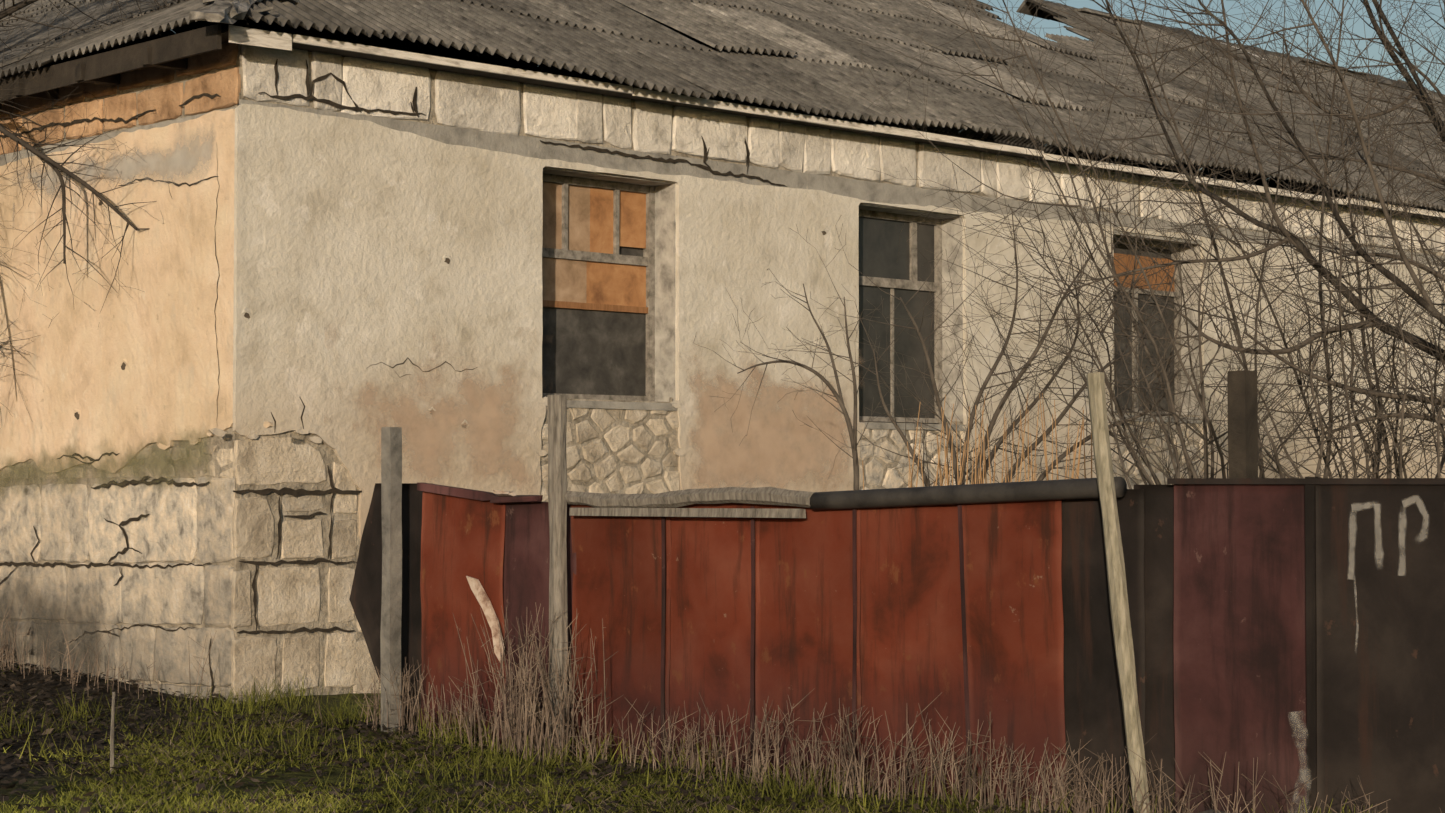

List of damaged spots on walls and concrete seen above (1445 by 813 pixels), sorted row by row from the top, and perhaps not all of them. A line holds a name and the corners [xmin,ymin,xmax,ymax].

crack [258,59,425,117]
crack [0,93,221,147]
crack [540,136,787,187]
crack [366,358,477,377]
crack [271,398,305,429]
crack [0,452,362,696]
flaking render [0,422,365,703]